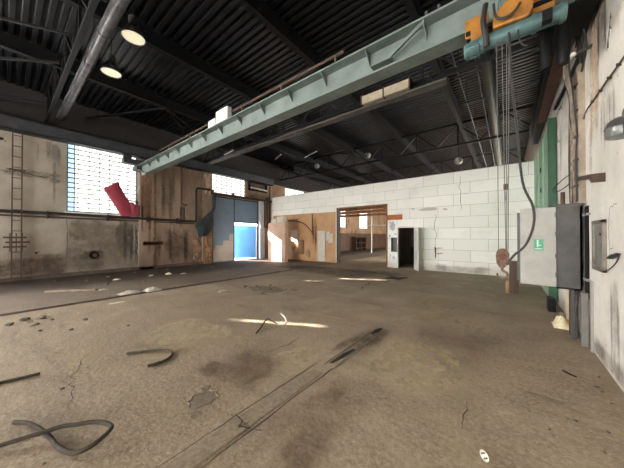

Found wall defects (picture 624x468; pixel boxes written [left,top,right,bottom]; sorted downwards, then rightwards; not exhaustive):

crack [62,343,98,410]